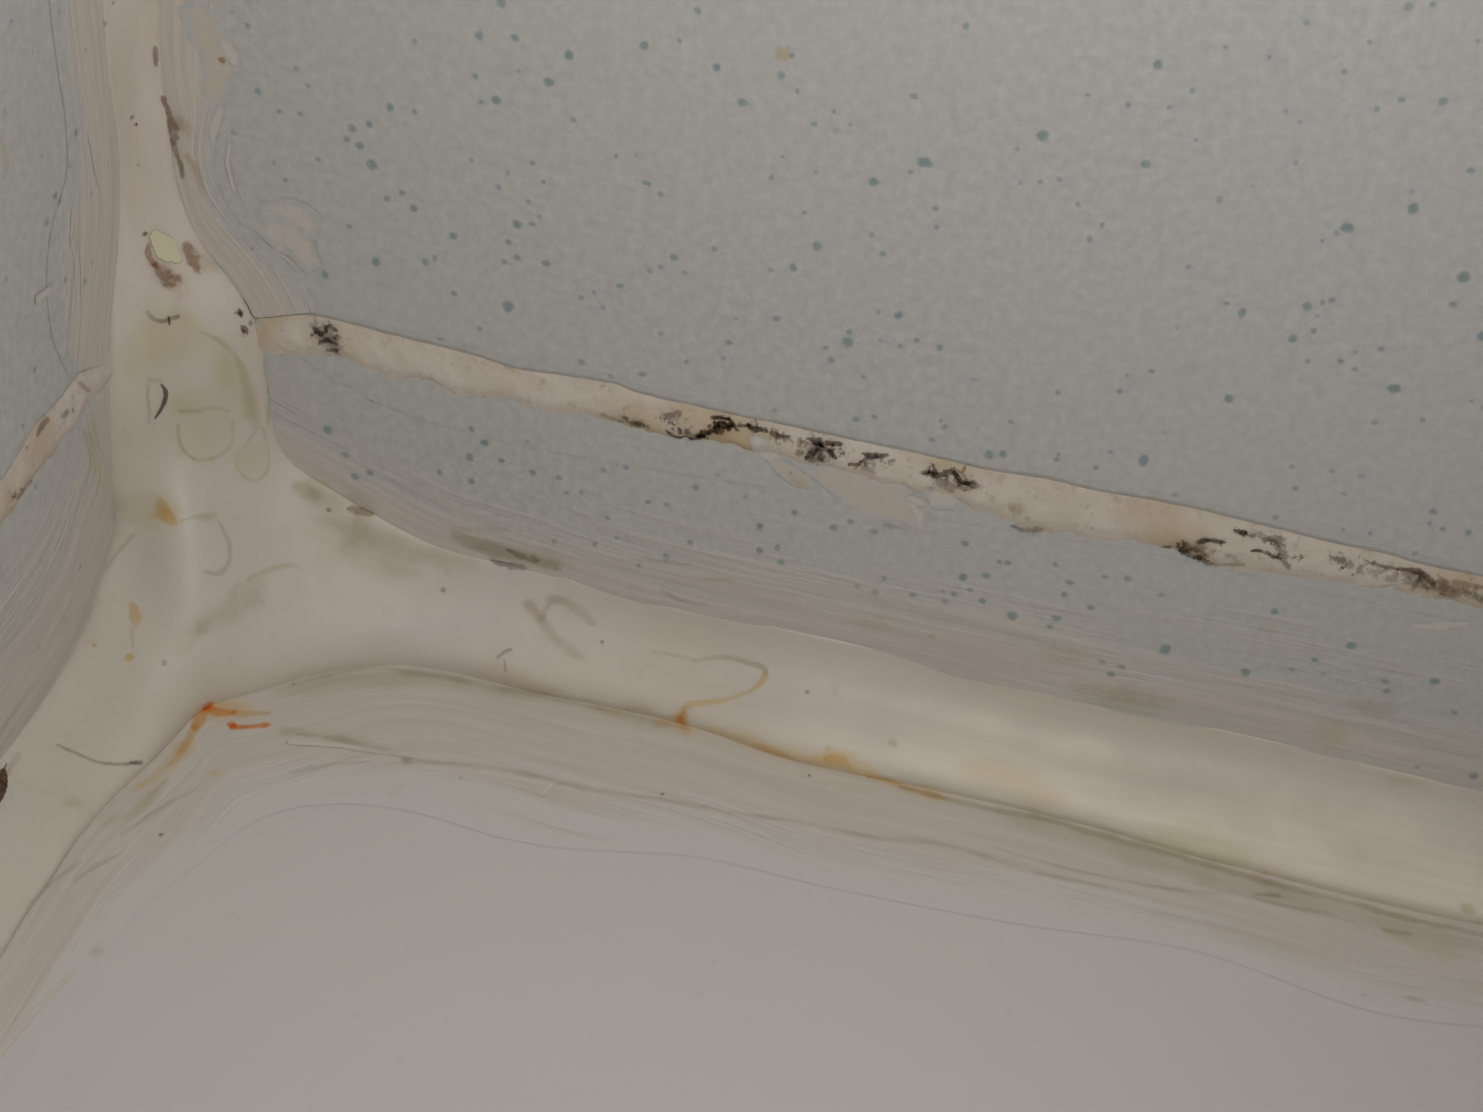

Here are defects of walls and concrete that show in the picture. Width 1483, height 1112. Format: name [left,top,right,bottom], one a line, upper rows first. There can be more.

water stain [666,416,773,438]
water stain [1202,529,1262,552]